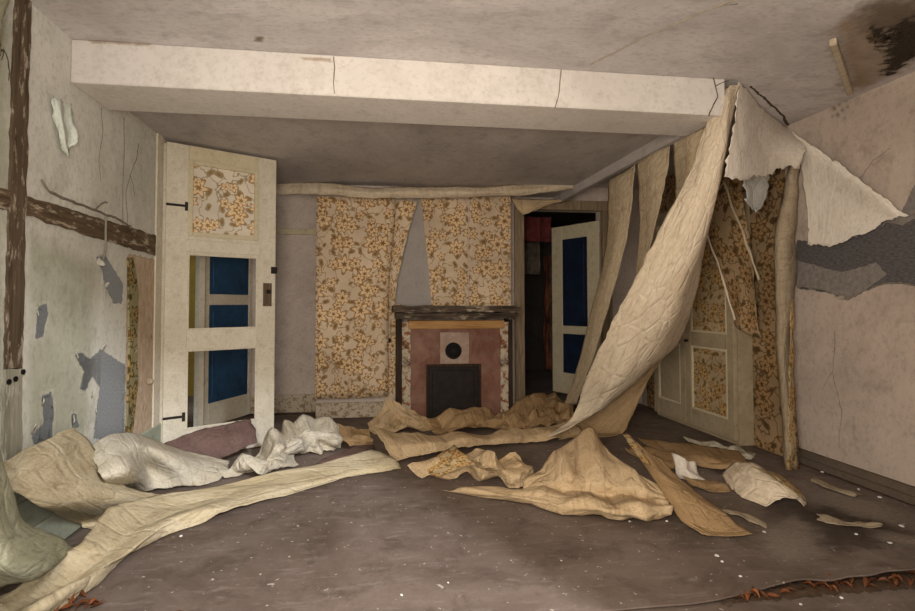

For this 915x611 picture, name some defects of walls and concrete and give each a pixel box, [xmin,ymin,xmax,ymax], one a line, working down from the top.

crack [590,0,738,65]
flaking render [35,303,48,339]
peeling [76,254,155,439]
peeling [395,198,431,306]
peeling [565,126,705,405]
flaking render [724,82,915,470]
flaking render [31,392,54,444]